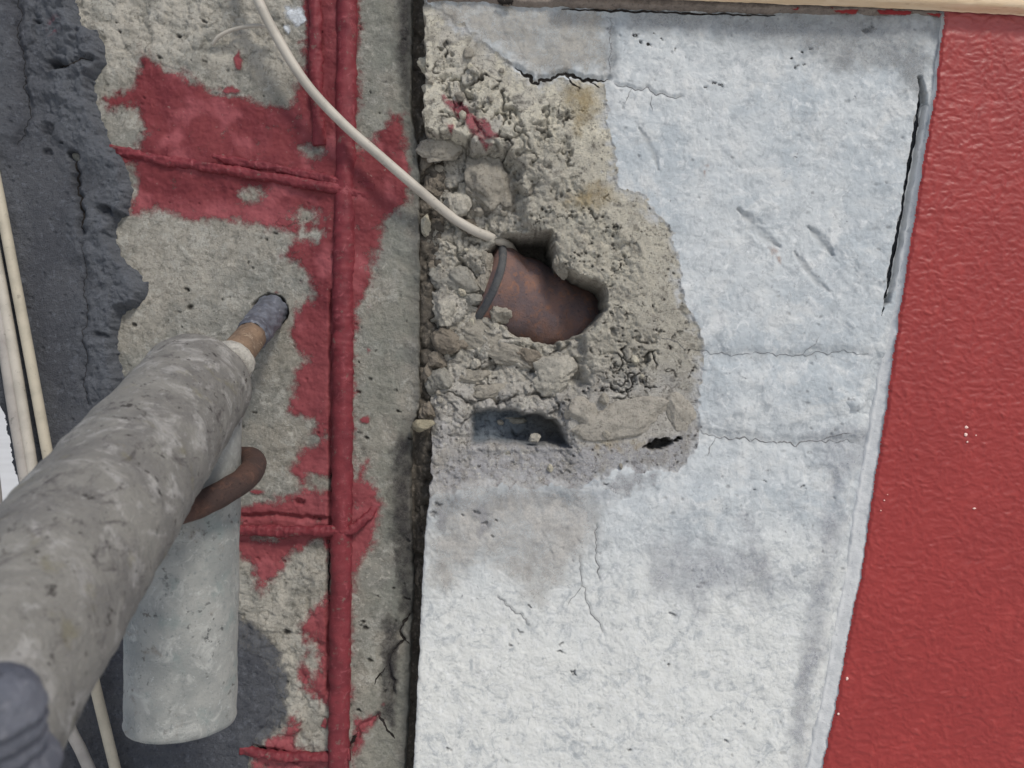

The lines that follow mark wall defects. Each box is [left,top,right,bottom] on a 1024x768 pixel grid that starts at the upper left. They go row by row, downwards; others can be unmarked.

crack [515,8,776,111]
crack [881,94,920,316]
crack [350,0,444,768]
spalling [103,0,705,768]
crack [663,336,859,357]
crack [698,428,852,454]